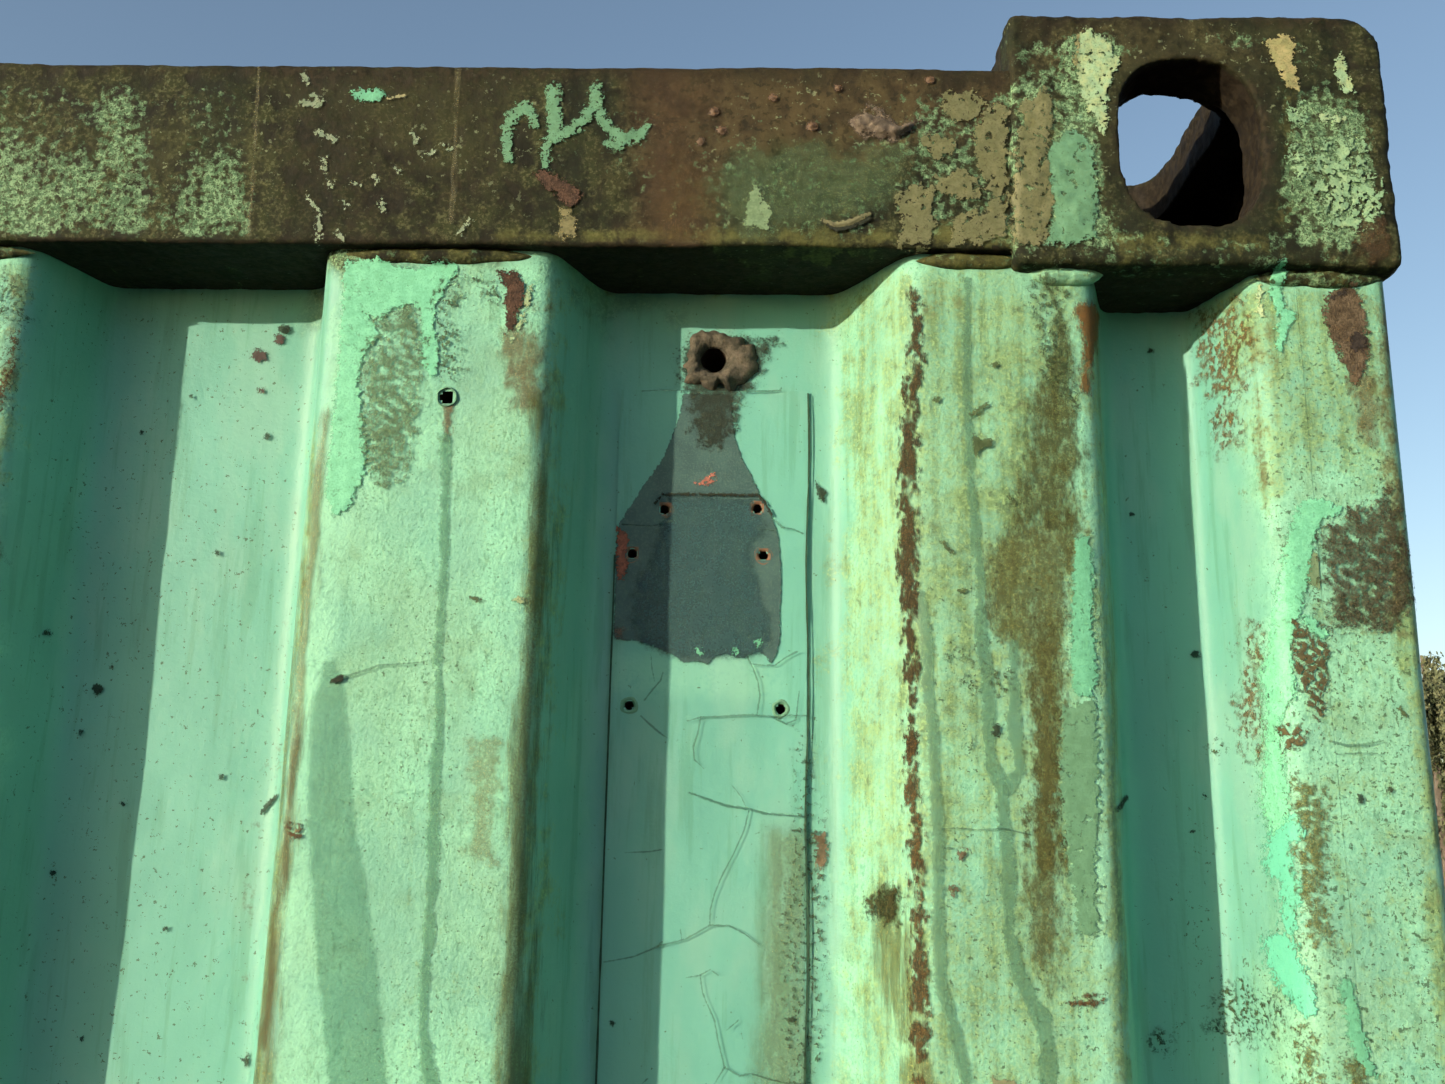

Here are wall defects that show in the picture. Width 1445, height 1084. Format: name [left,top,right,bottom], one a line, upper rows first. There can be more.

peeling [894,25,1122,254]
peeling [1261,33,1388,242]
damp [0,271,30,326]
peeling [613,394,782,665]
rust [253,414,328,1084]
rust [810,827,829,876]
rust [892,286,933,1084]
damp [914,277,1068,1084]